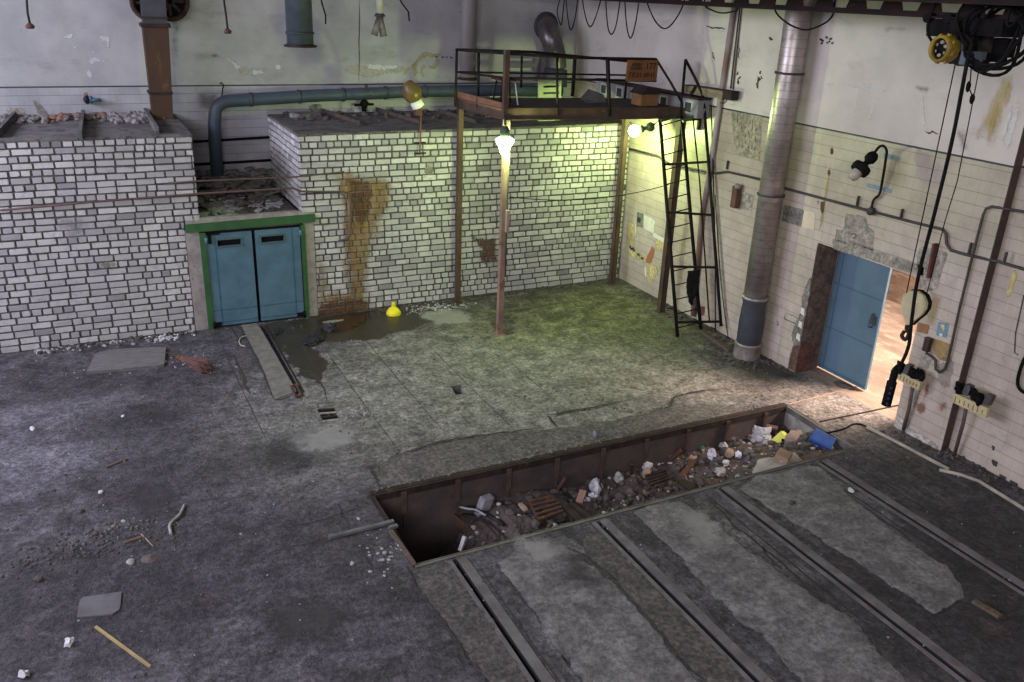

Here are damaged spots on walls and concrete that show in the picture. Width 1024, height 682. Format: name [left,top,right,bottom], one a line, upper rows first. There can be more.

peeling [731,112,762,160]
damp [986,82,1019,148]
rust [319,174,388,315]
peeling [916,247,947,291]
damp [265,299,471,384]